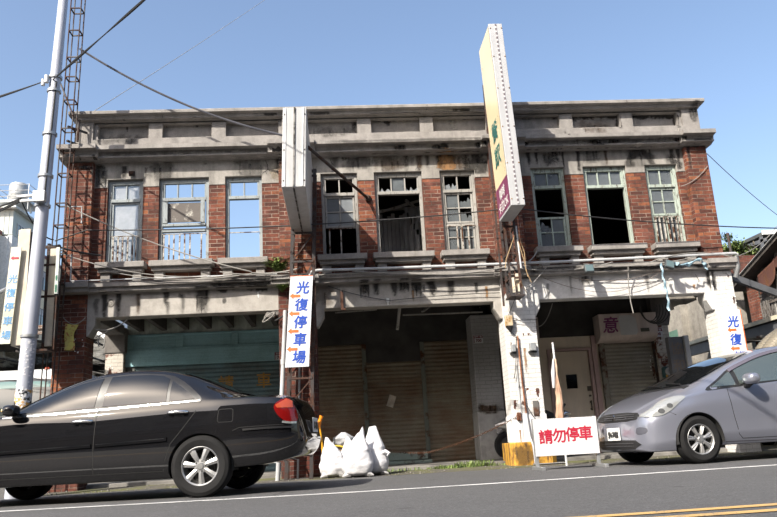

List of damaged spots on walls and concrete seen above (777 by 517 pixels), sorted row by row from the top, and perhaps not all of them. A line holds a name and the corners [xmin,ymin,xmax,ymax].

water stain [632,115,679,126]
water stain [347,153,377,168]
corrosion [437,148,456,170]
water stain [425,130,492,173]
water stain [525,142,565,168]
water stain [626,147,655,166]
water stain [666,135,711,169]
water stain [94,290,121,317]
water stain [360,278,436,304]